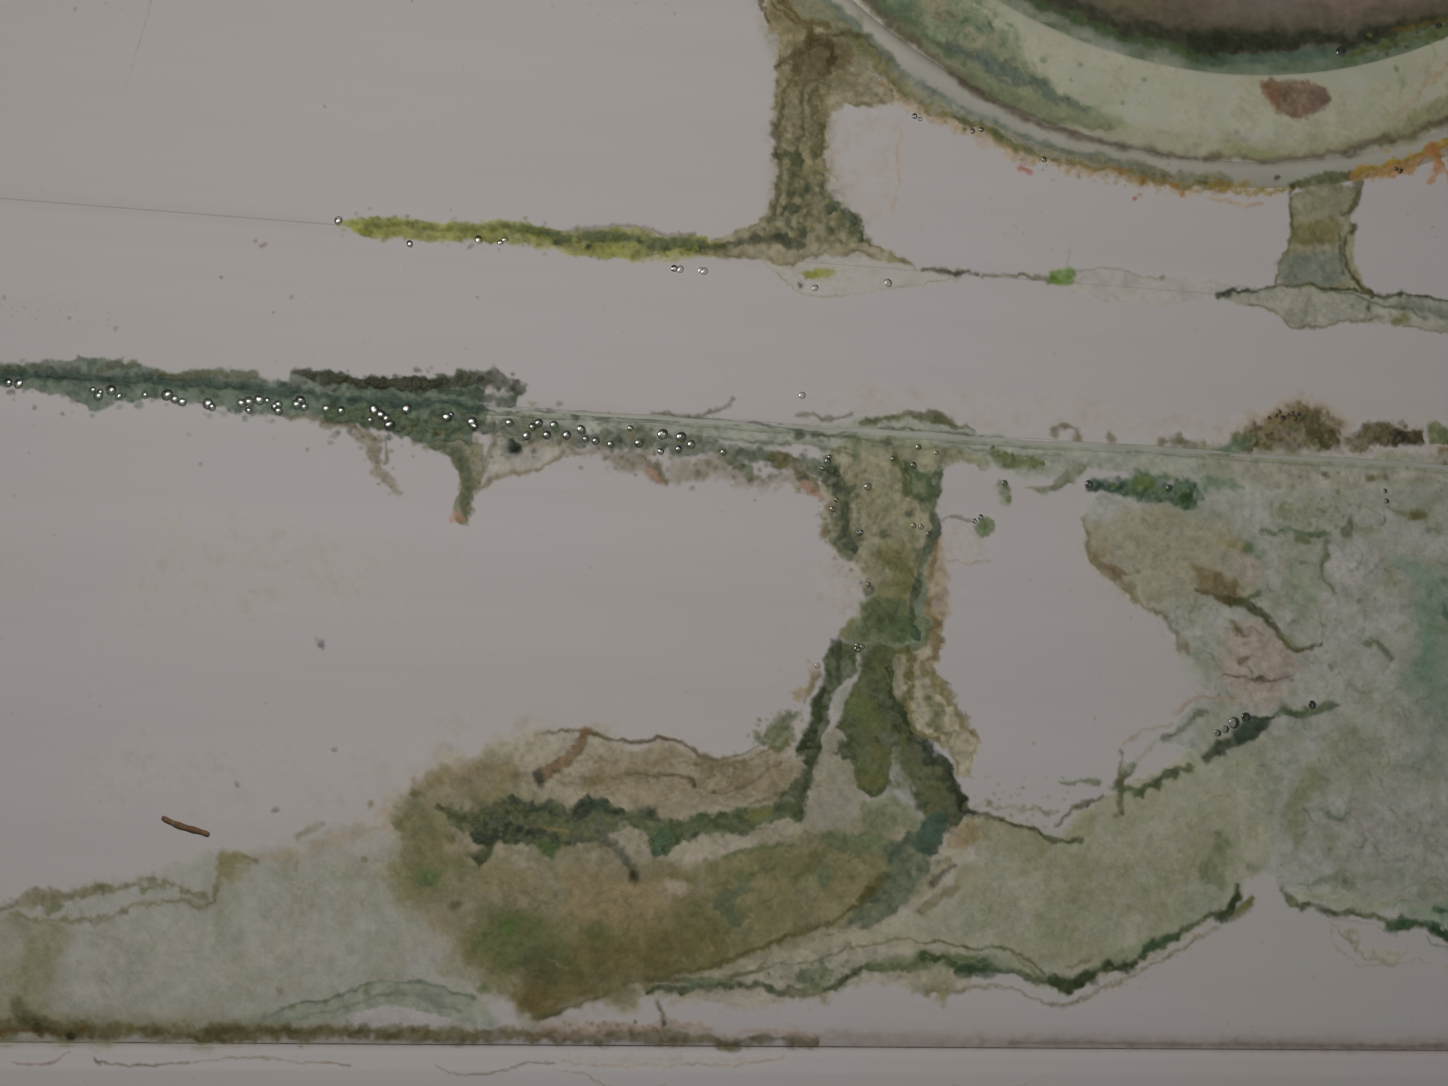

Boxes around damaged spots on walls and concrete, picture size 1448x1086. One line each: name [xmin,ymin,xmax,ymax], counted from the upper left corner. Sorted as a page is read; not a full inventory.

water stain [773,8,863,150]
water stain [1261,78,1330,117]
mould [481,437,562,488]
water stain [1273,505,1353,561]
water stain [1225,596,1314,652]
water stain [798,687,826,749]
water stain [818,618,978,928]
water stain [1096,703,1338,815]